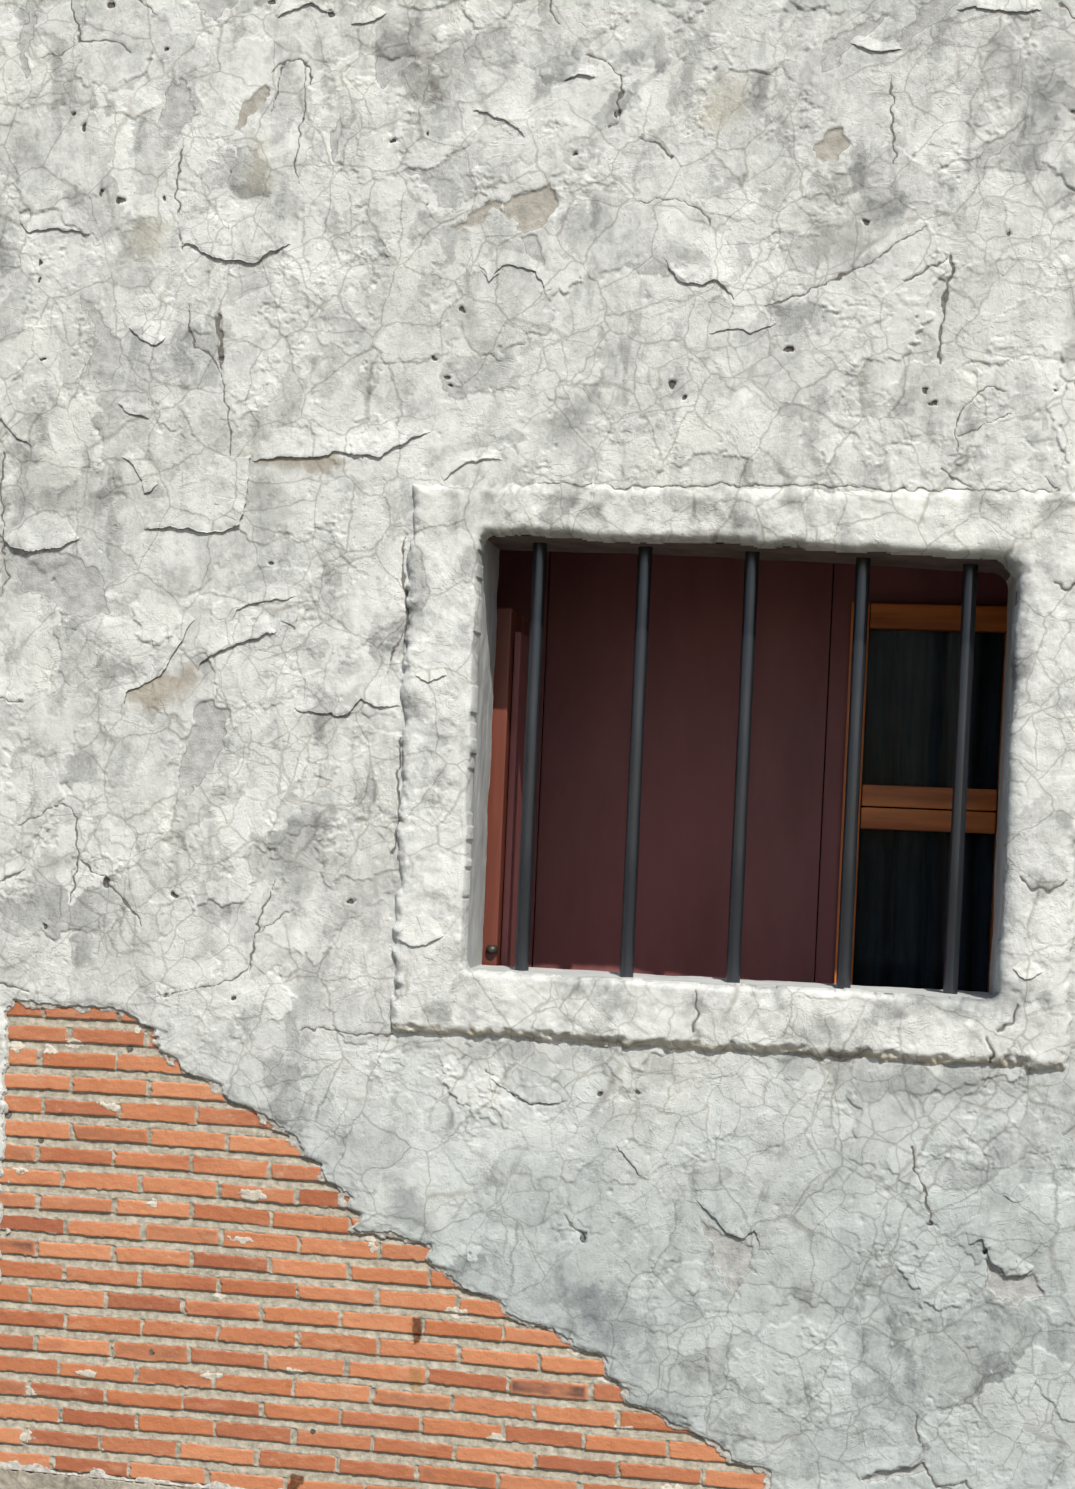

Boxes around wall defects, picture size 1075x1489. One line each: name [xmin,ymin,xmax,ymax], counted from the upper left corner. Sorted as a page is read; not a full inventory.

spalling [235,85,270,130]
spalling [813,127,850,162]
spalling [451,182,559,295]
crack [765,226,955,364]
crack [188,305,232,455]
crack [545,386,1060,492]
crack [390,537,409,666]
crack [21,803,142,927]
spalling [0,999,771,1489]
flaking render [697,1185,786,1292]
corrosion [412,1318,422,1343]
corrosion [288,1474,304,1489]